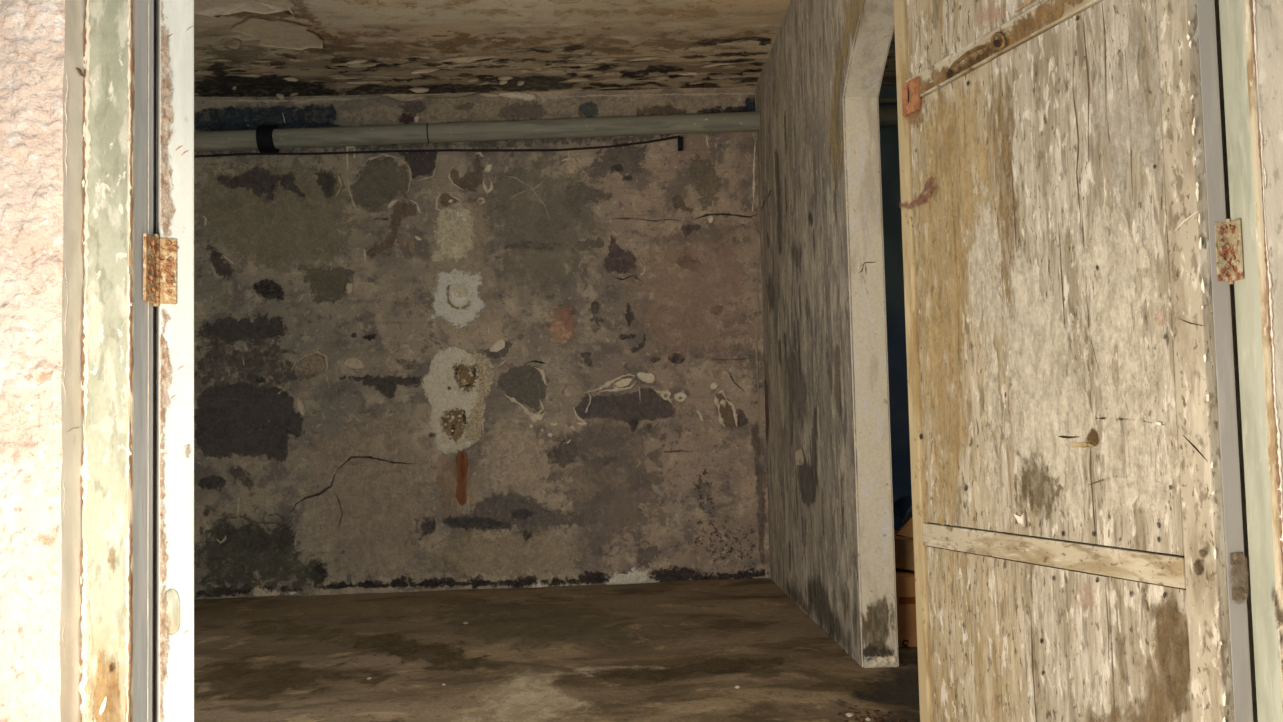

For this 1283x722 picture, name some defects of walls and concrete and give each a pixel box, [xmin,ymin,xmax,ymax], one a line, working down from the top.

peeling [194,0,771,104]
water stain [194,115,898,722]
flaking render [422,326,748,454]
crack [239,456,413,529]
corrosion [456,451,467,505]